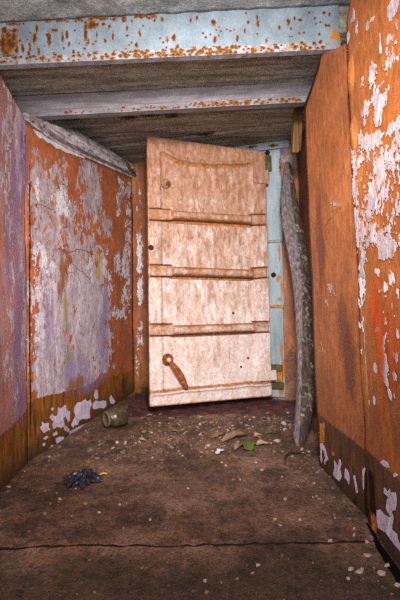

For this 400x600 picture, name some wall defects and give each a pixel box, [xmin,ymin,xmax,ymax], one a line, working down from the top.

corrosion [0,12,283,64]
corrosion [278,11,341,51]
corrosion [117,97,302,112]
peeling [351,0,400,331]
peeling [0,80,144,409]
peeling [373,333,398,401]
peeling [40,390,115,447]
peeling [320,422,400,551]
crack [0,523,400,587]